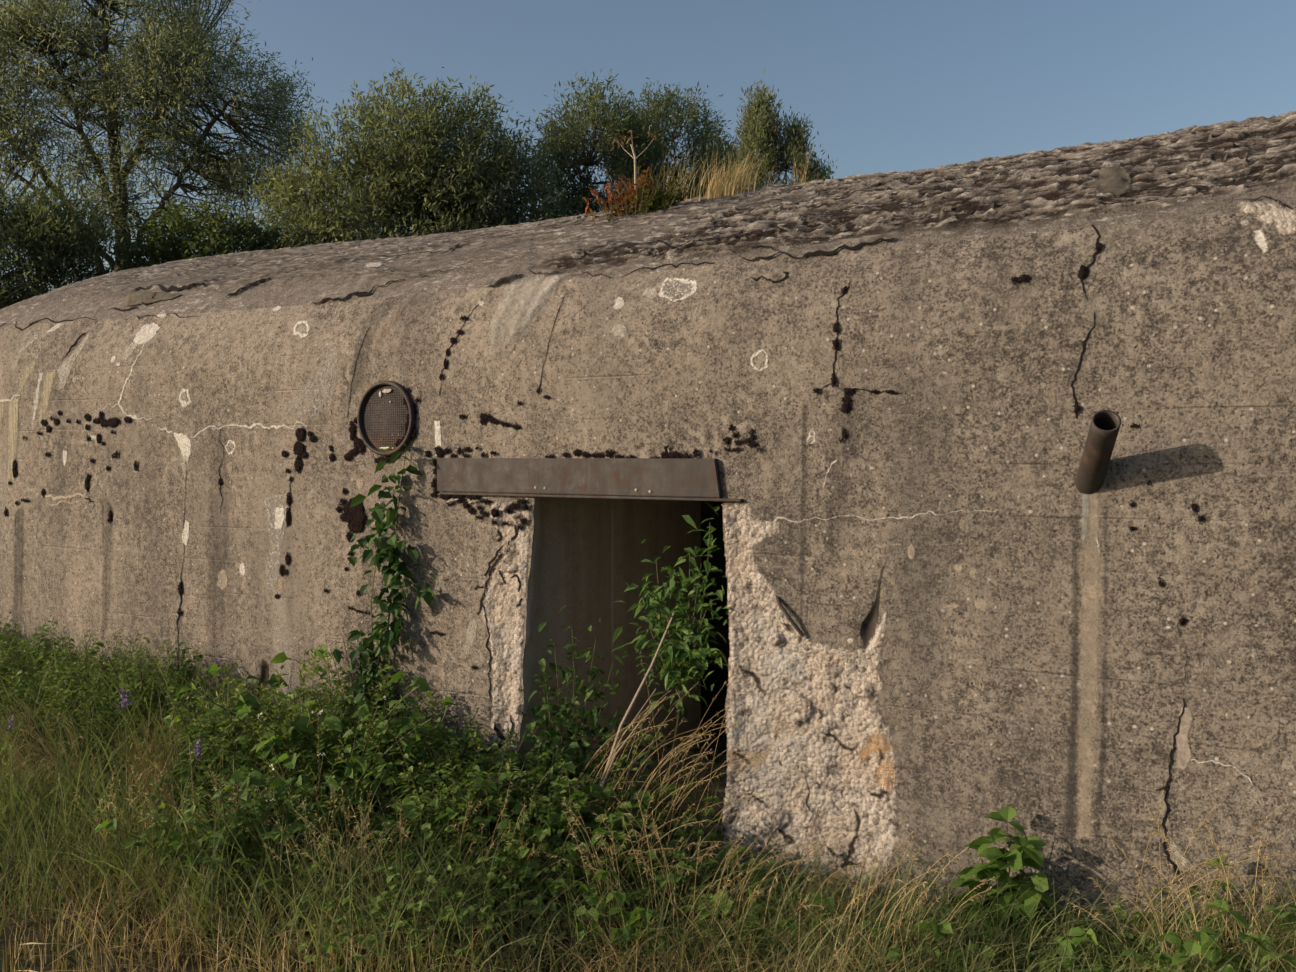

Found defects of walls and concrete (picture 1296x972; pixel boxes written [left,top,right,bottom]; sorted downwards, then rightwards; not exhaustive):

crack [347,327,370,418]
crack [303,244,460,304]
crack [439,227,900,405]
crack [1071,224,1103,419]
spalling [1237,202,1296,252]
crack [474,541,522,704]
spalling [722,502,900,907]
water stain [1066,493,1104,838]
crack [1156,621,1250,875]